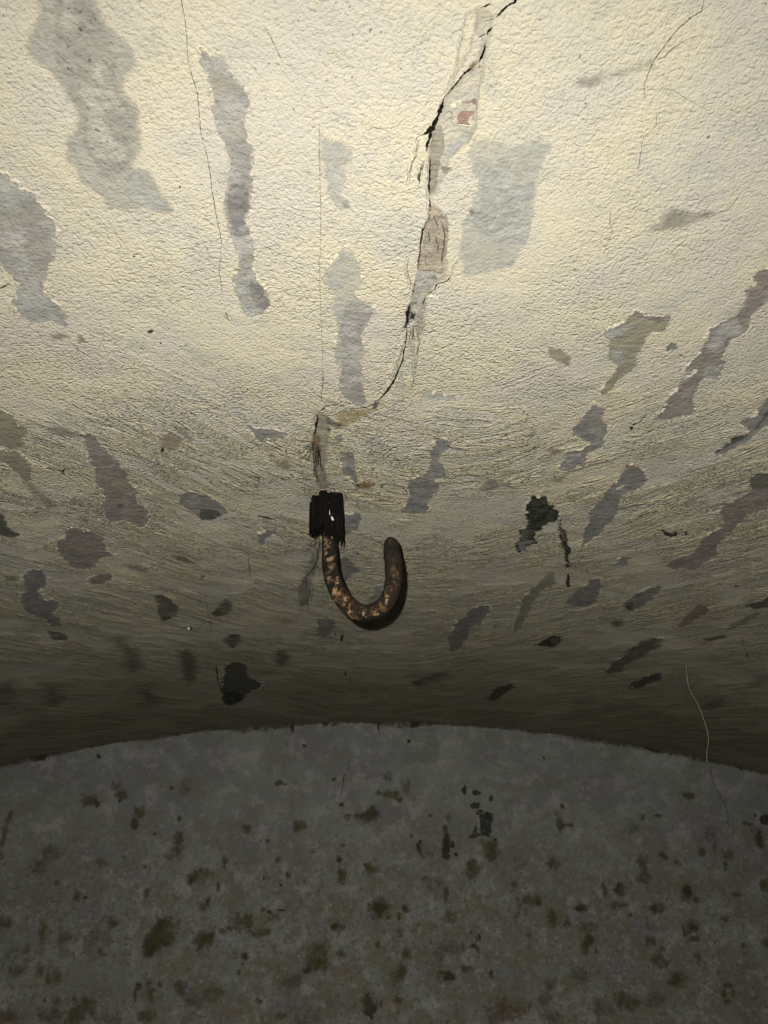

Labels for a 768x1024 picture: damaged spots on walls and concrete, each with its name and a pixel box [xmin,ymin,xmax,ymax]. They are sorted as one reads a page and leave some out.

crack [307,0,517,439]
peeling [411,9,491,317]